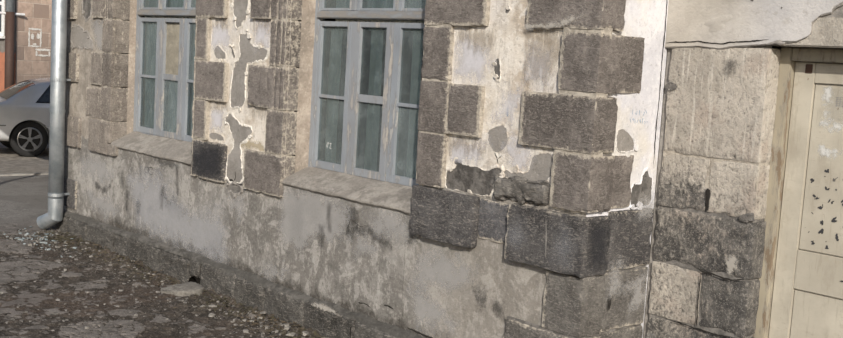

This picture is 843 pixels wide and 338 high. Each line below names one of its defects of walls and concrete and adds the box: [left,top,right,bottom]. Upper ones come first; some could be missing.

flaking render [823,6,843,17]
flaking render [209,0,269,199]
leakage [133,177,223,257]
leakage [193,147,220,177]
leakage [281,192,413,251]
flaking render [487,121,510,154]
flaking render [443,148,554,206]
flaking render [629,167,653,210]